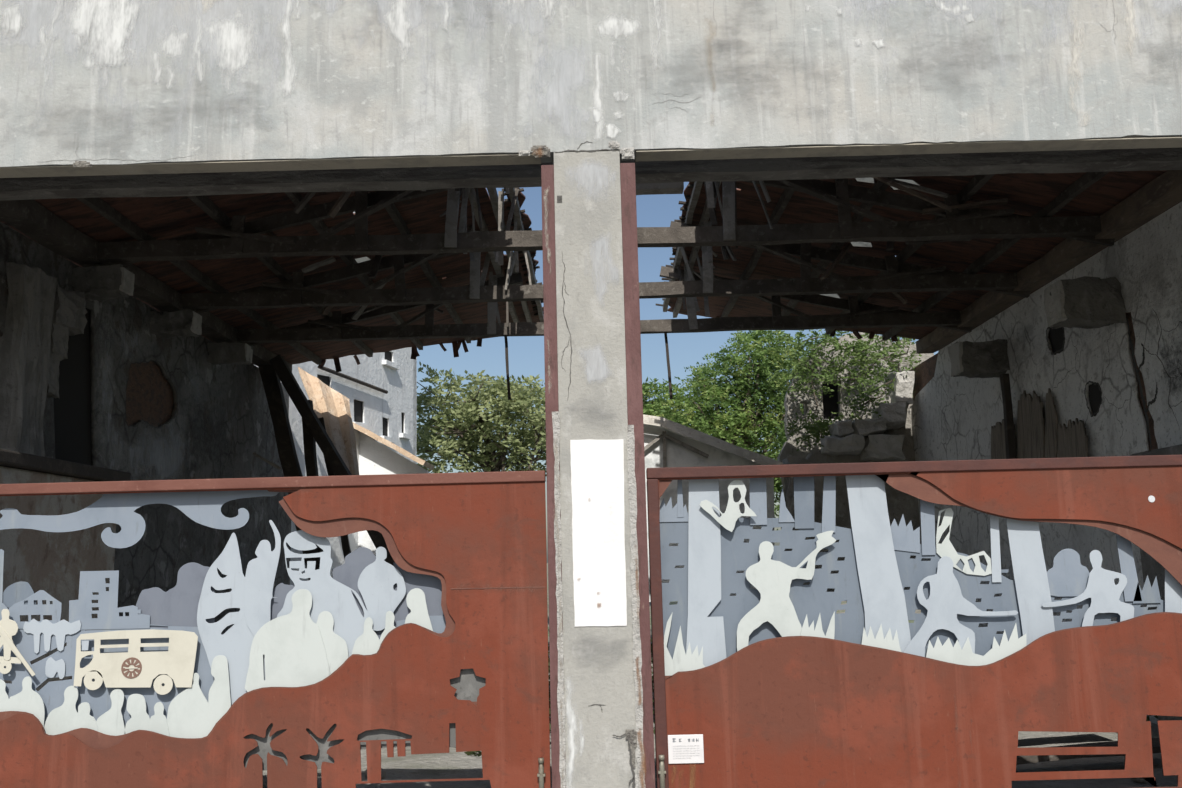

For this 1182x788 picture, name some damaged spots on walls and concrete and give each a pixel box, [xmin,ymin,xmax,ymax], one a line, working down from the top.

leakage [2,0,299,95]
crack [561,254,572,401]
crack [1054,308,1182,449]